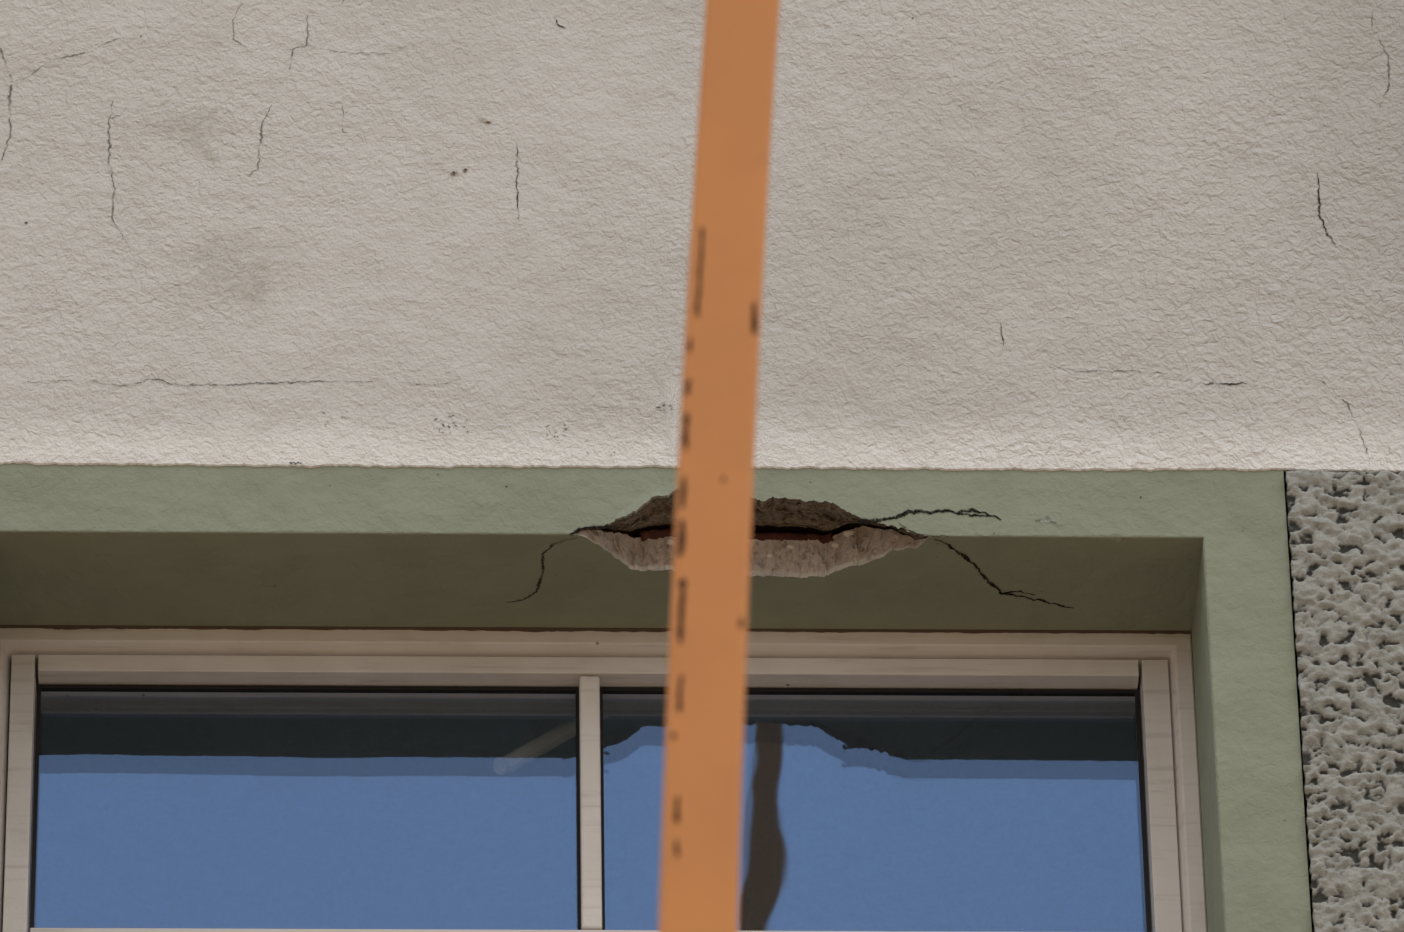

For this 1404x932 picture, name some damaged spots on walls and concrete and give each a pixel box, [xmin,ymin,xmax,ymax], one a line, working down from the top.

crack [0,39,115,159]
crack [107,101,127,243]
crack [146,378,324,386]
crack [506,525,619,603]
spalling [572,492,676,571]
spalling [749,497,928,578]
crack [858,508,1072,608]